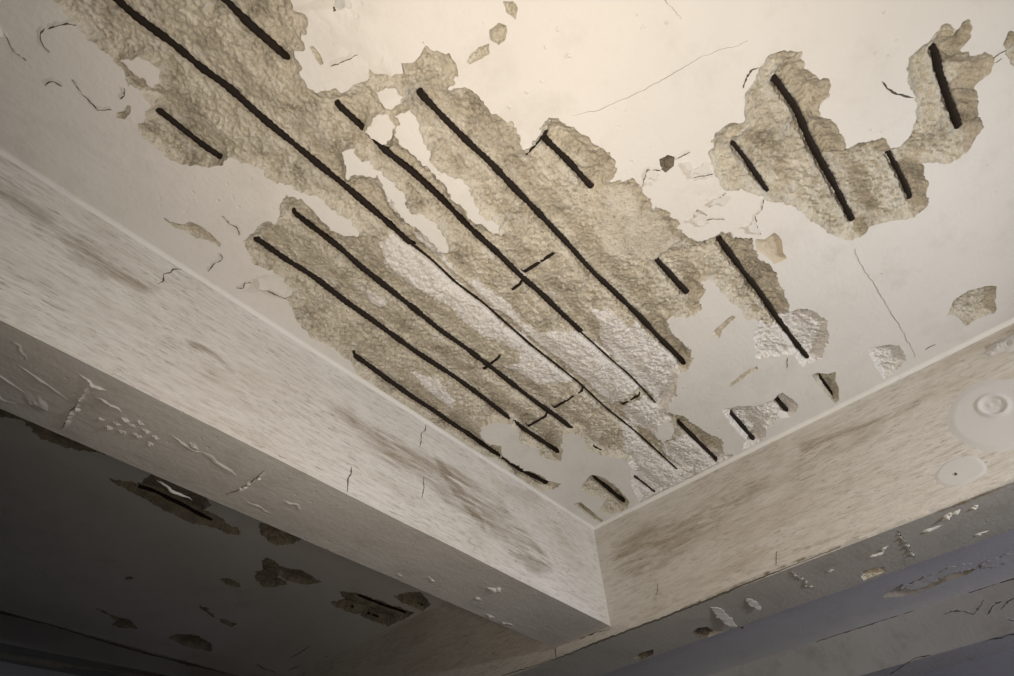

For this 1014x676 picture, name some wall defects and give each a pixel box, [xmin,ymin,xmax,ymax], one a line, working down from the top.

crack [574,40,748,116]
spalling [708,19,1014,241]
spalling [53,0,839,522]
spalling [947,286,997,326]
spalling [868,344,906,379]
spalling [0,409,106,455]
spalling [109,474,241,535]
spalling [258,523,301,546]
spalling [254,558,321,587]
spalling [861,567,886,580]
spalling [331,591,431,626]
peeling [710,607,744,629]